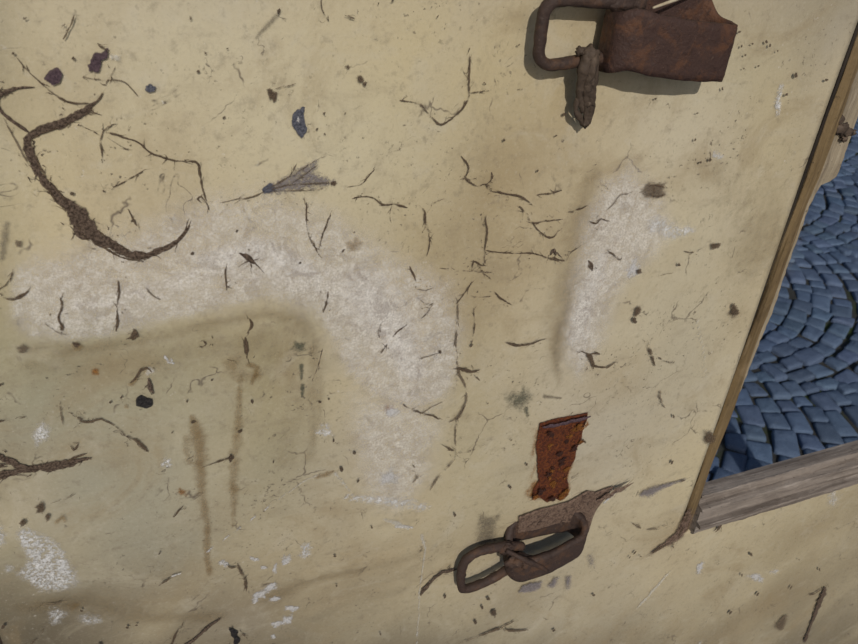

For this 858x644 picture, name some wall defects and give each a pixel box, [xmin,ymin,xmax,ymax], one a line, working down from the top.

crack [399,48,489,126]
crack [0,58,241,334]
crack [292,193,331,258]
crack [350,156,645,490]
crack [0,407,148,483]
corrosion [527,413,591,502]